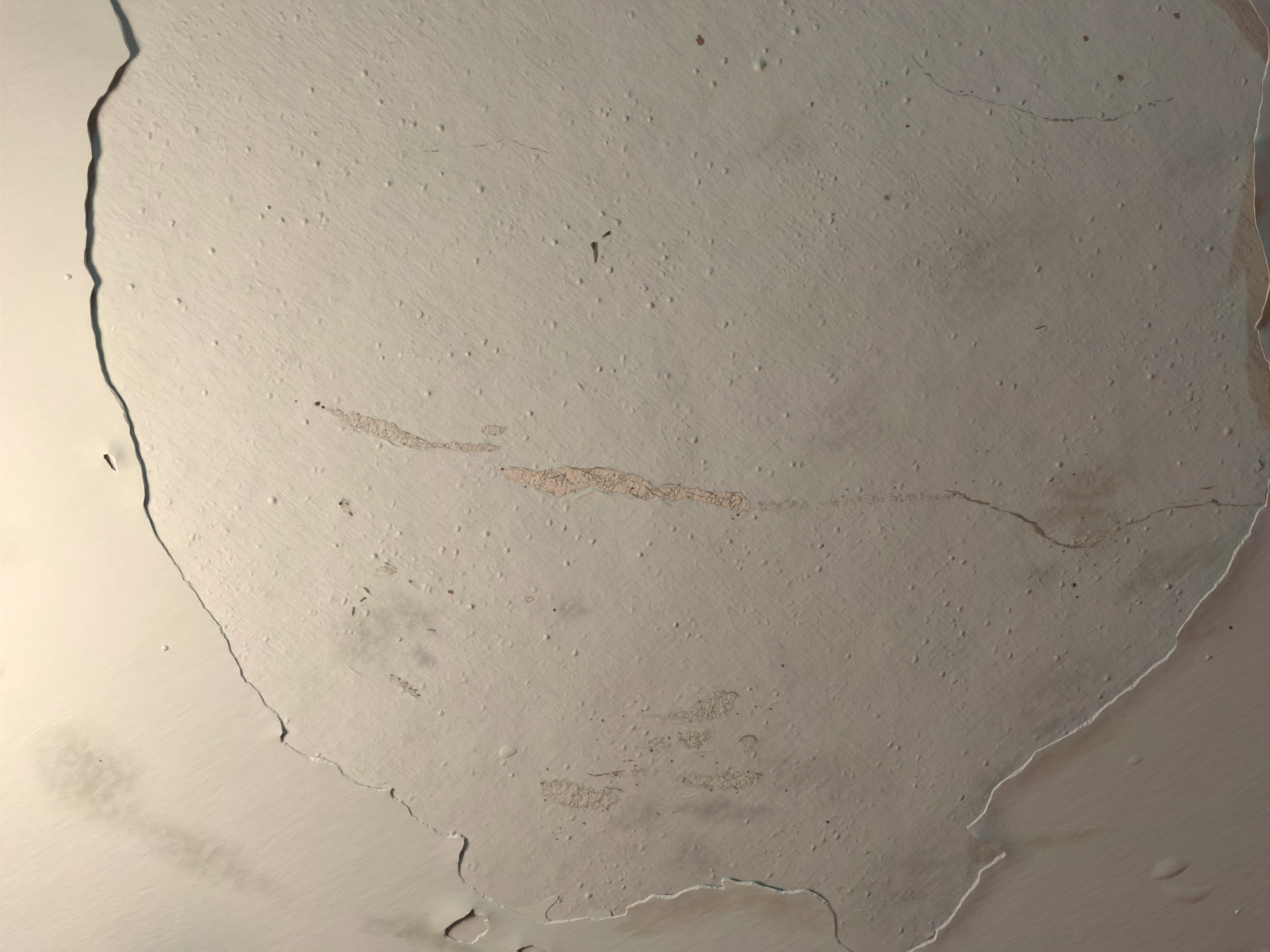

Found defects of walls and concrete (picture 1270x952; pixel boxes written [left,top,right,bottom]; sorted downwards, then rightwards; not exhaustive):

peeling [90,301,130,432]
peeling [104,454,117,471]
crack [295,400,1260,566]
peeling [152,528,227,640]
peeling [1176,491,1269,637]
peeling [239,667,283,735]
spalling [667,691,739,722]
spalling [678,771,763,791]
peeling [967,642,1177,830]
peeling [444,909,488,944]
peeling [606,878,834,918]
peeling [907,851,1006,952]